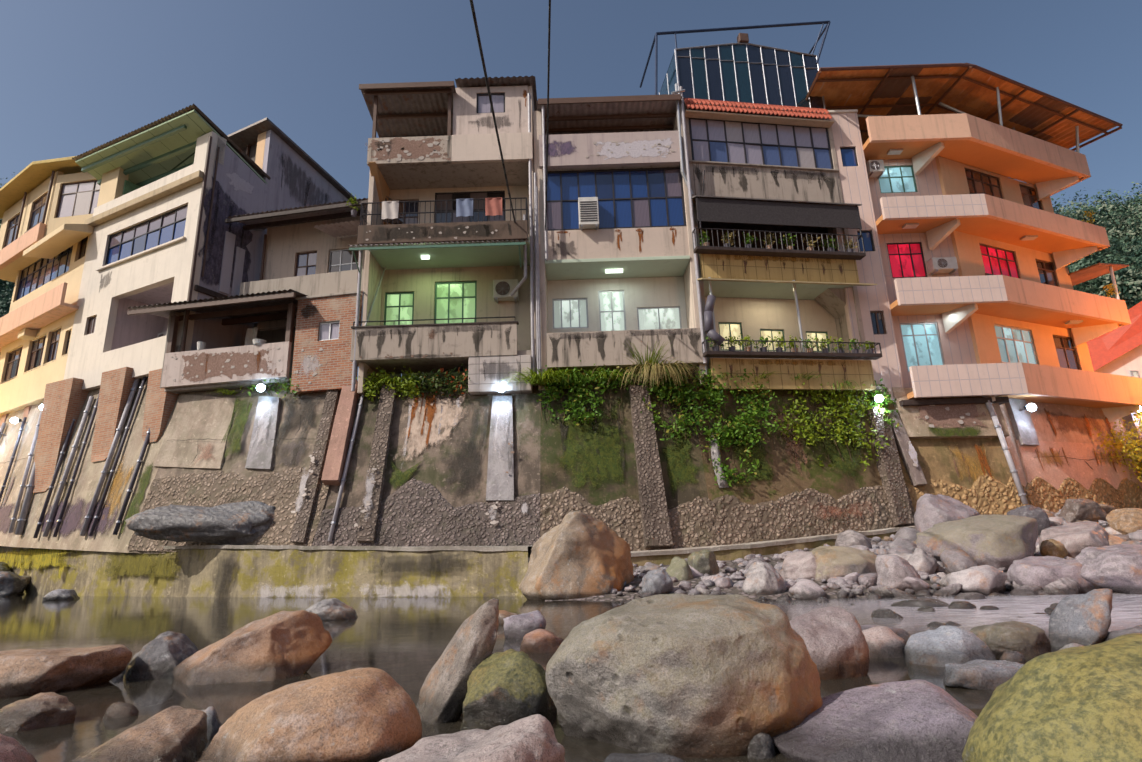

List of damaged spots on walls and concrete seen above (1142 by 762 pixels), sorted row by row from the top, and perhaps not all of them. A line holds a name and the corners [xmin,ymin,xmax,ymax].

peeling [366,137,451,162]
peeling [586,138,674,160]
water stain [694,167,747,191]
water stain [771,171,798,192]
water stain [812,174,835,199]
water stain [357,330,458,356]
water stain [472,328,511,351]
water stain [550,335,606,361]
water stain [658,331,700,356]
peeling [171,347,323,384]
corrosion [408,394,436,444]